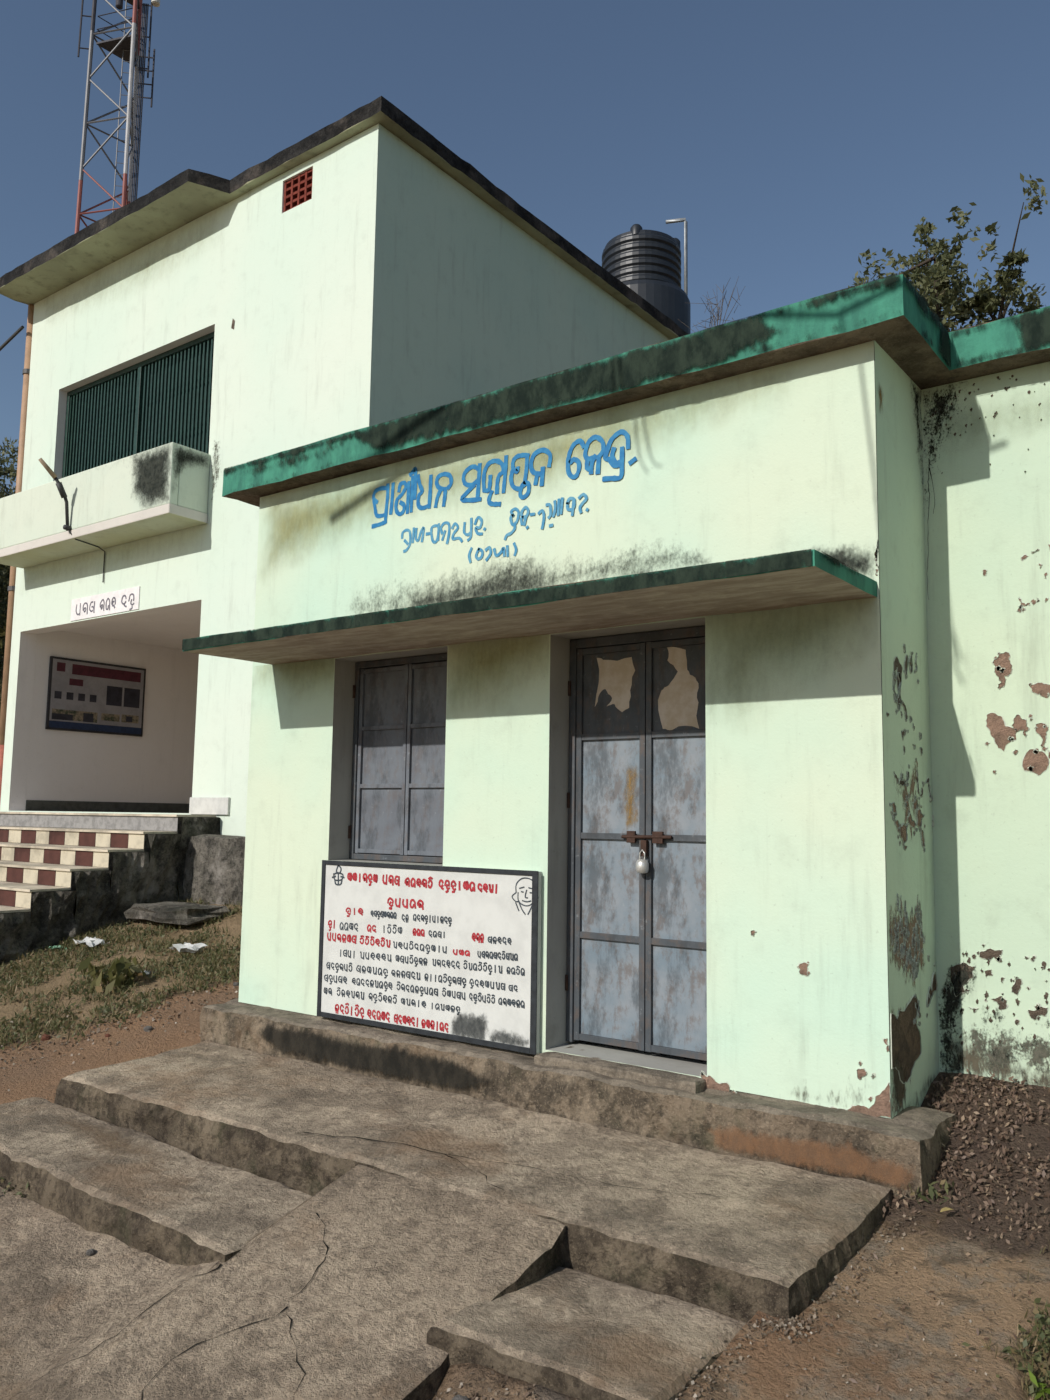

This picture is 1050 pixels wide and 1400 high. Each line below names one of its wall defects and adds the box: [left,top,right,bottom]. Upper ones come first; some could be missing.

water stain [133,309,783,505]
water stain [806,274,1050,493]
water stain [281,504,347,540]
water stain [182,549,869,650]
peeling [1016,597,1049,613]
peeling [992,652,1013,690]
peeling [1029,682,1050,698]
peeling [886,644,934,853]
peeling [984,712,1050,776]
peeling [797,961,810,977]
spalling [829,893,1050,1118]
water stain [939,965,1050,1085]